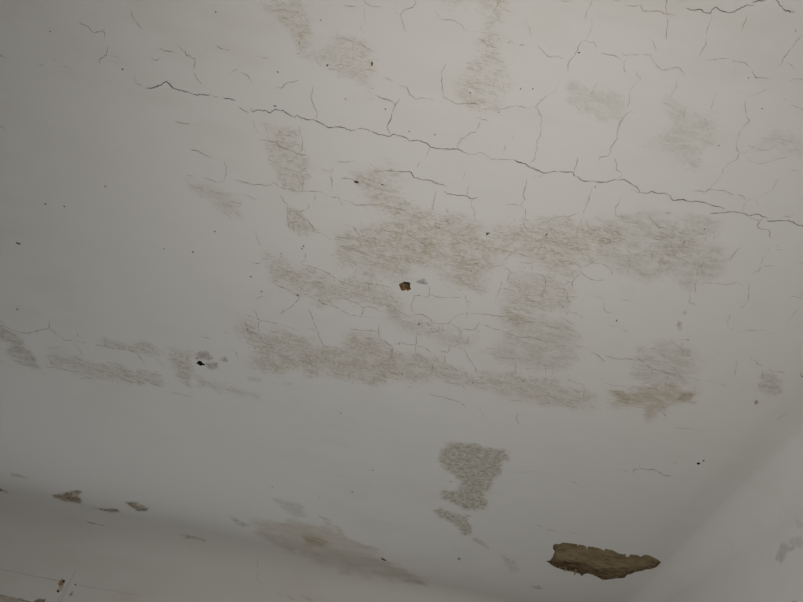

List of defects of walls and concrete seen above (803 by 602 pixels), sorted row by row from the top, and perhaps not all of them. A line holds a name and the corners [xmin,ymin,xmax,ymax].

flaking render [547,542,661,580]